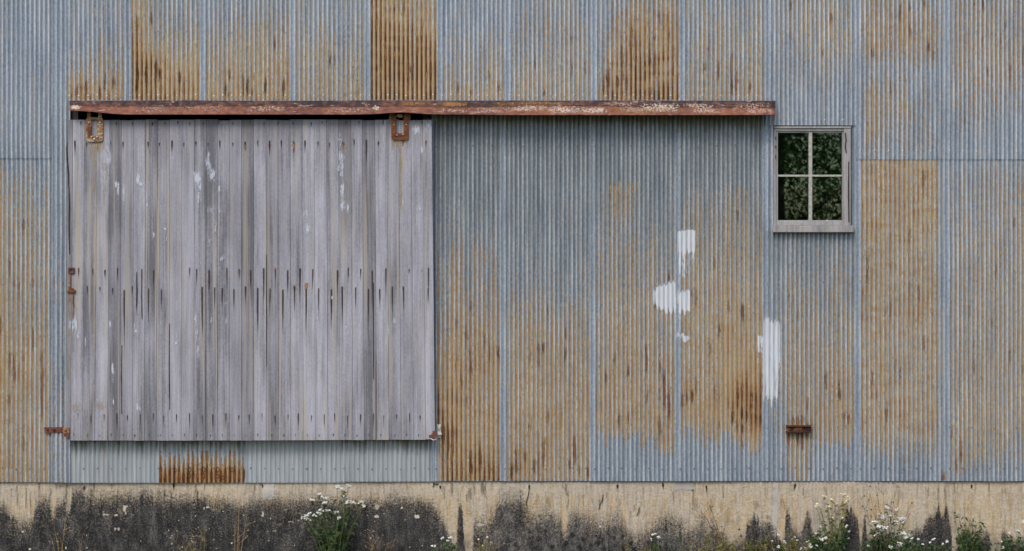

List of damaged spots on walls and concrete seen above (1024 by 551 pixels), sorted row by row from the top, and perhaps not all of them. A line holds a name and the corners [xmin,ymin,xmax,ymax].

corrosion [67,0,764,123]
corrosion [776,0,1024,490]
corrosion [0,162,74,482]
corrosion [436,181,763,490]
corrosion [159,451,245,490]
water stain [0,483,812,551]
water stain [843,506,884,551]
water stain [908,505,1023,551]